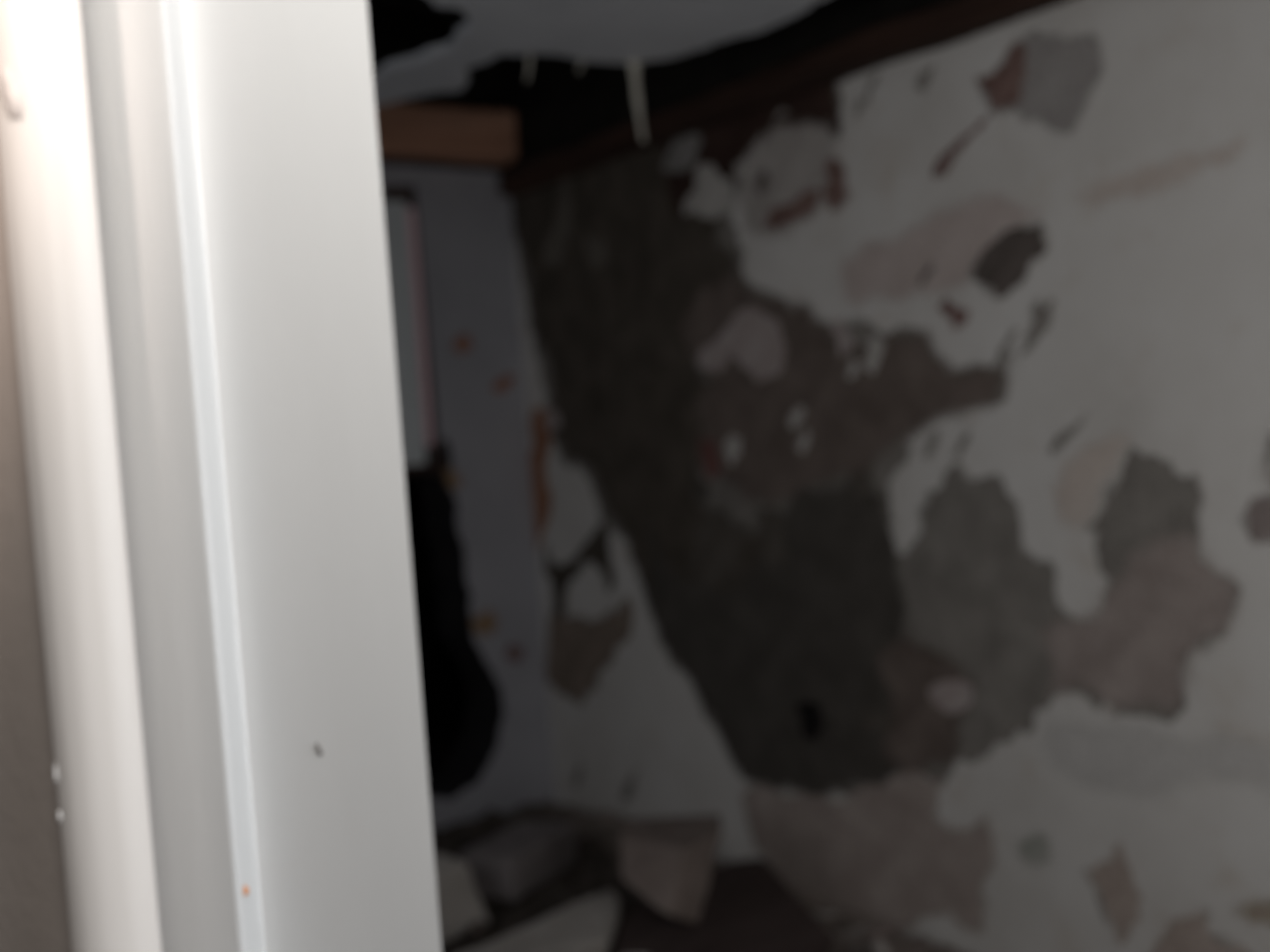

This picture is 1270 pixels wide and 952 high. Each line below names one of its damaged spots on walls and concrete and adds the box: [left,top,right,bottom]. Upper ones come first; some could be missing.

peeling [975,27,1104,135]
flaking render [511,83,1251,800]
peeling [1240,432,1270,545]